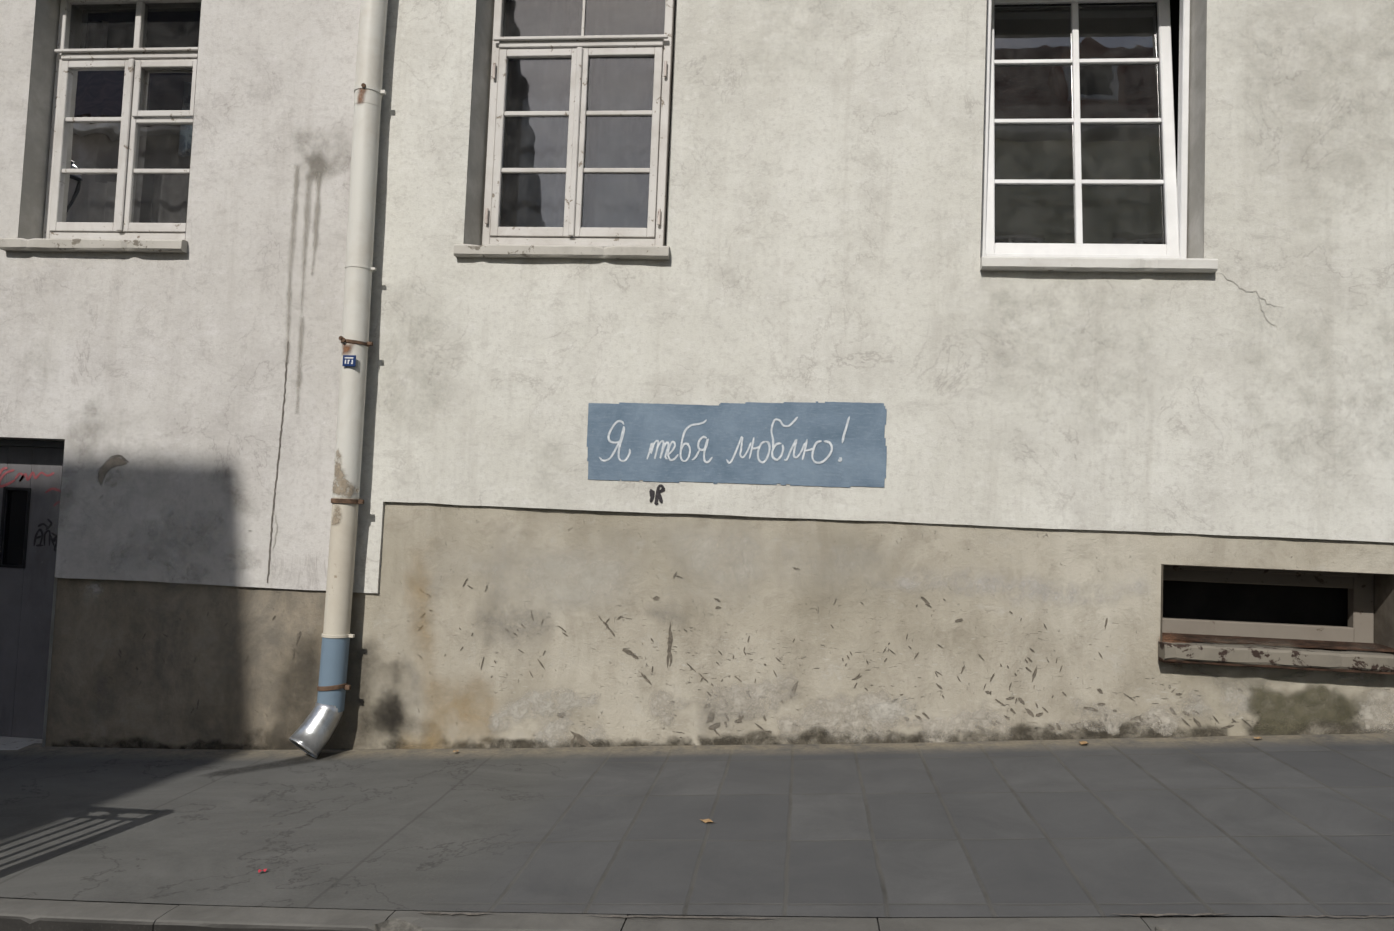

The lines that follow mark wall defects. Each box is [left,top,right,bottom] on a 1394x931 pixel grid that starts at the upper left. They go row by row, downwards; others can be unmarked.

leakage [293,156,324,263]
spalling [96,455,128,499]
peeling [332,450,357,524]
leakage [355,652,1227,749]
leakage [1248,698,1394,736]